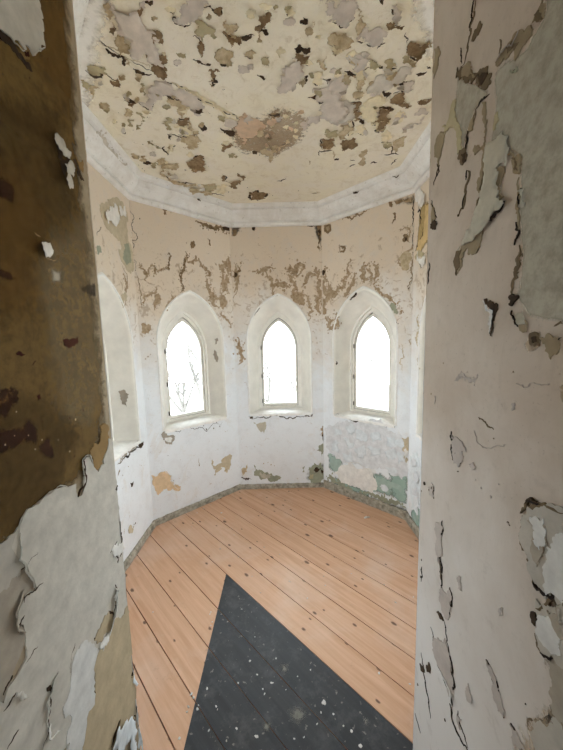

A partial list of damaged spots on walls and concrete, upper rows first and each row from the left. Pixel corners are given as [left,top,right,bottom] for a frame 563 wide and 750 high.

spalling [495,0,546,73]
peeling [81,0,441,201]
water stain [232,109,310,163]
water stain [0,0,106,543]
peeling [252,256,404,334]
peeling [434,99,563,359]
peeling [325,413,434,515]
peeling [0,423,144,750]
crack [455,576,463,591]
spalling [518,497,563,669]
crack [415,655,473,748]
crack [486,659,525,750]